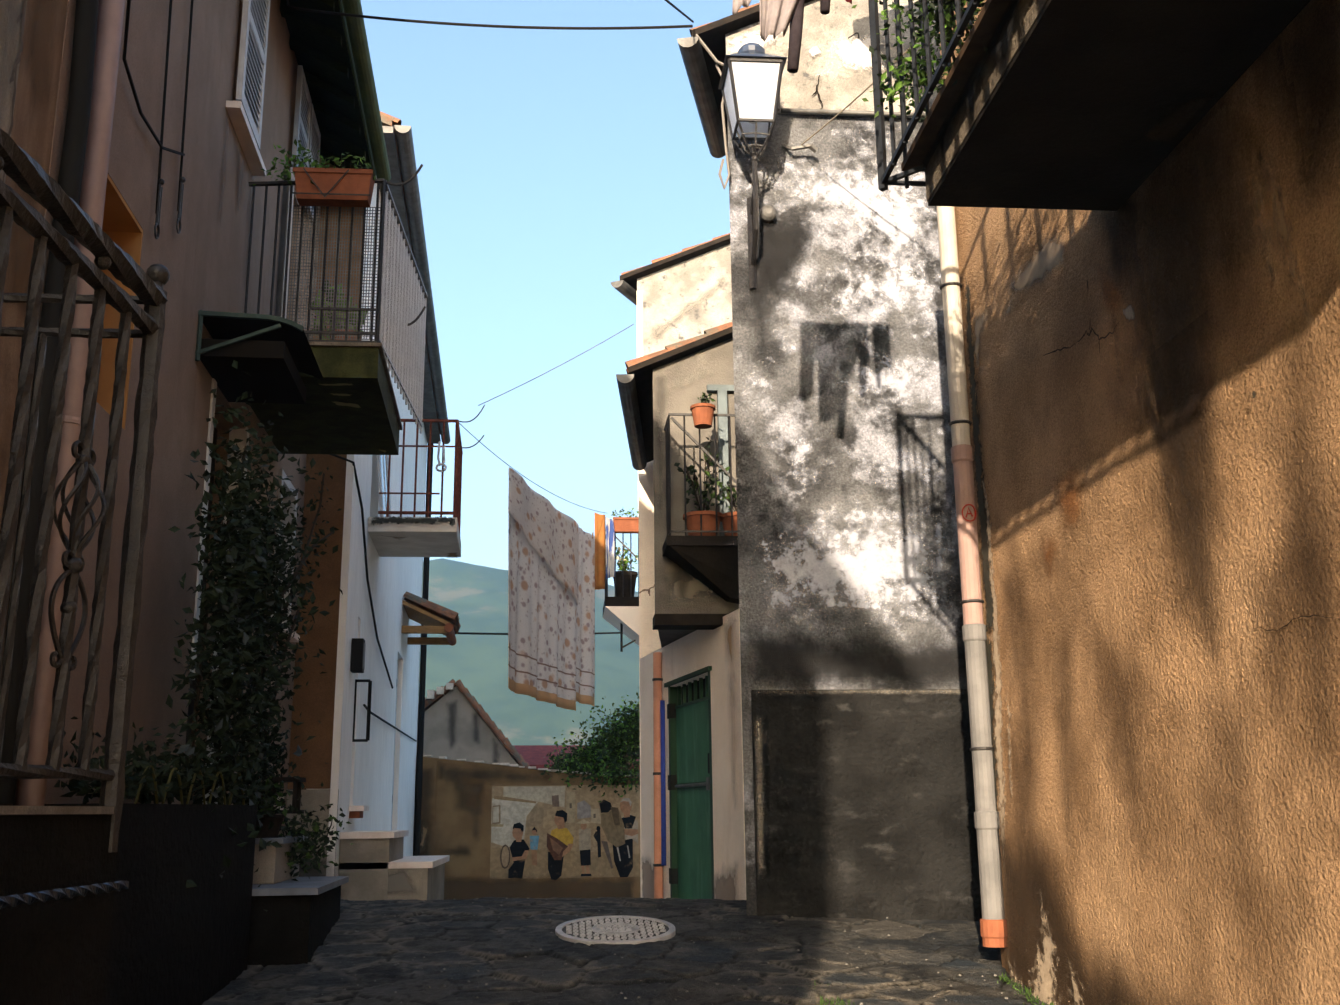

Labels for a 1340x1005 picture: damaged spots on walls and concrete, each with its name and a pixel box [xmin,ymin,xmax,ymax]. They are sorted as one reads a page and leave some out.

damp [754,227,805,328]
crack [1043,323,1119,356]
damp [753,637,967,686]
flaking render [1011,914,1056,1005]